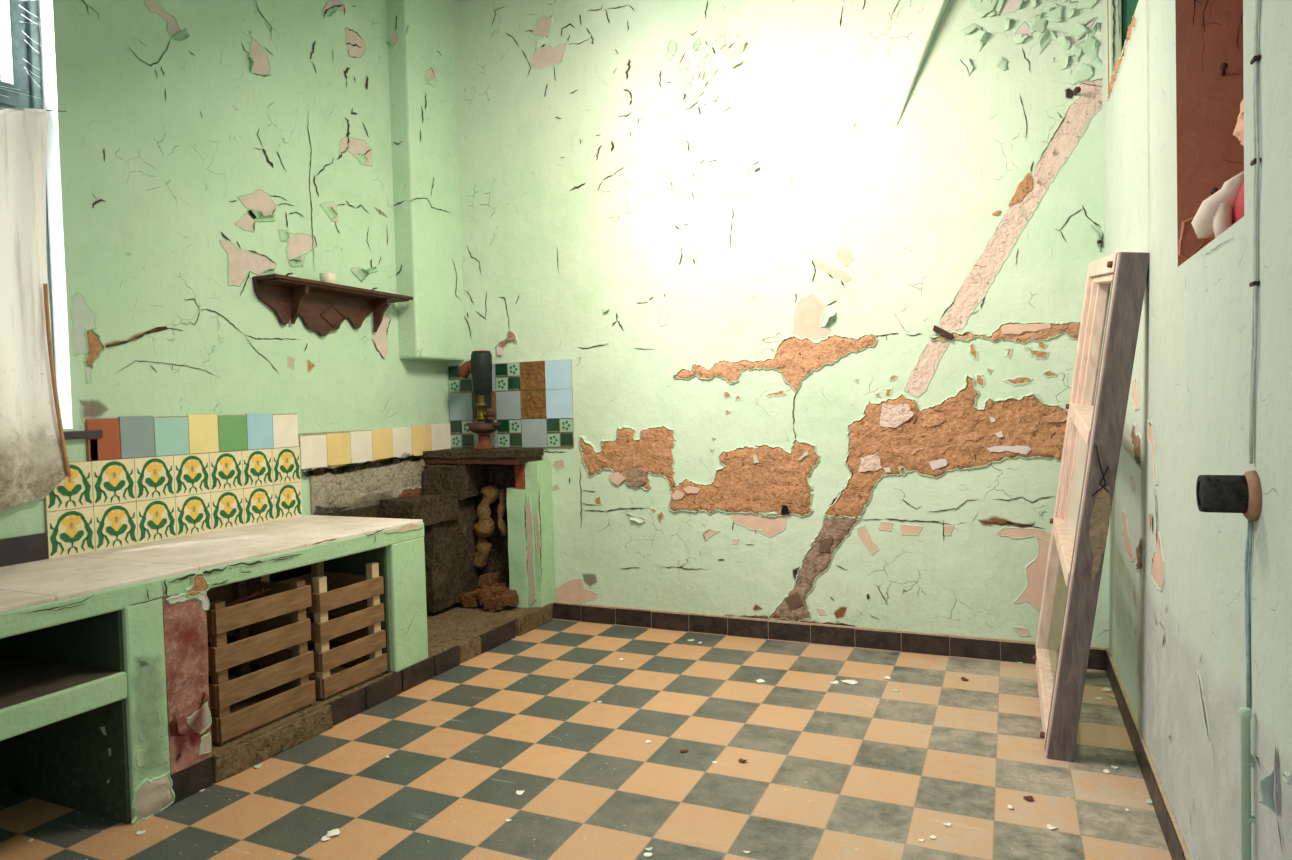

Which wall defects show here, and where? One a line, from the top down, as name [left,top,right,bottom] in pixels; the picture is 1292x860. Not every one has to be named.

crack [310,40,427,145]
crack [544,3,670,190]
crack [107,298,301,376]
peeling [219,189,317,296]
crack [255,111,334,271]
peeling [320,201,388,244]
peeling [350,227,381,282]
peeling [371,312,391,359]
crack [452,246,519,337]
crack [579,294,665,349]
spalling [523,0,1137,622]
peeling [1120,378,1165,593]